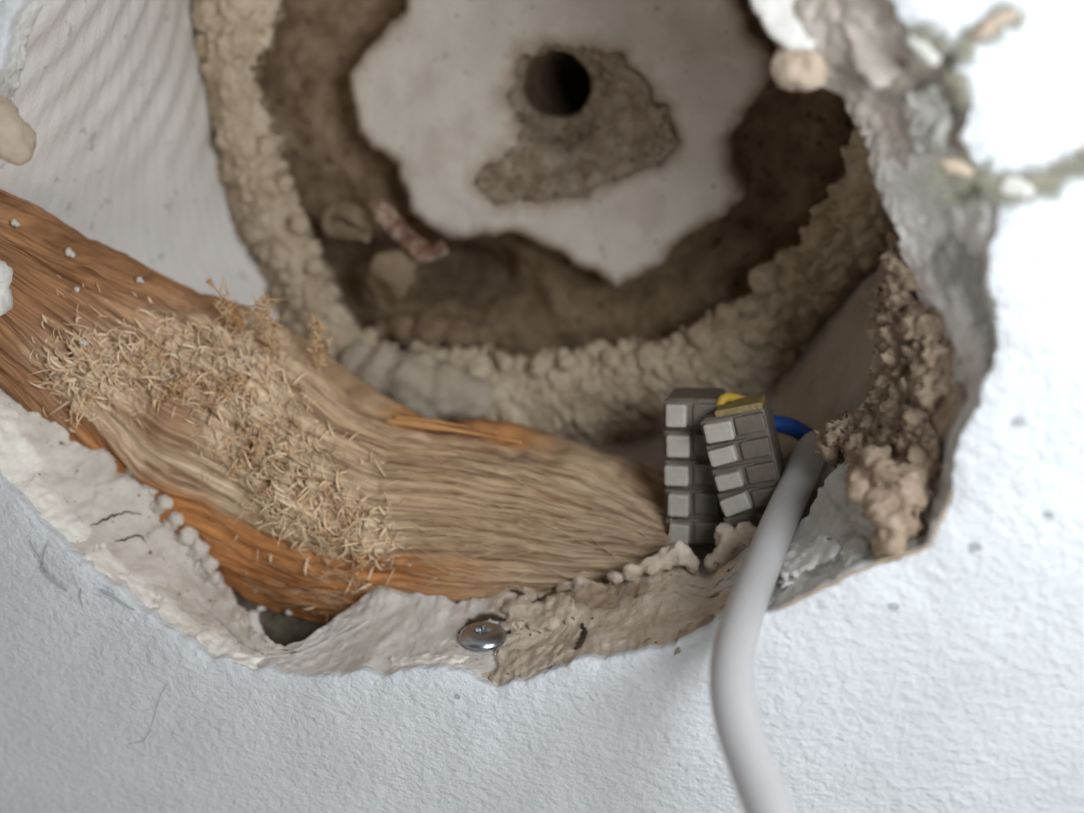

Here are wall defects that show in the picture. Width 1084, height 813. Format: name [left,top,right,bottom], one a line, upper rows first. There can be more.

flaking render [0,0,48,101]
crack [904,6,1024,109]
spalling [473,44,678,205]
crack [929,146,1084,208]
flaking render [750,0,998,610]
crack [91,511,147,543]
flaking render [0,386,757,686]